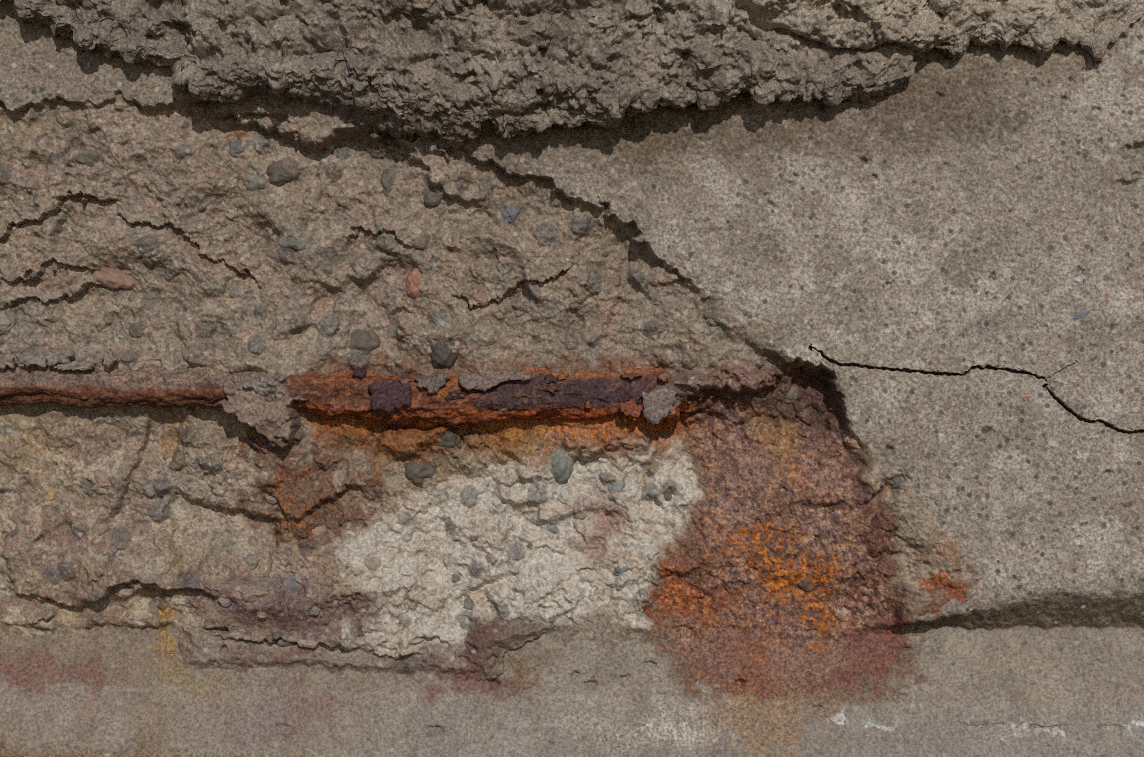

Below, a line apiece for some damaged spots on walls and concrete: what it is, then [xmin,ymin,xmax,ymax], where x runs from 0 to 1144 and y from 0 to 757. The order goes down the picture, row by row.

spalling [0,90,984,681]
corrosion [315,355,923,749]
corrosion [919,572,968,621]
crack [811,345,1144,437]